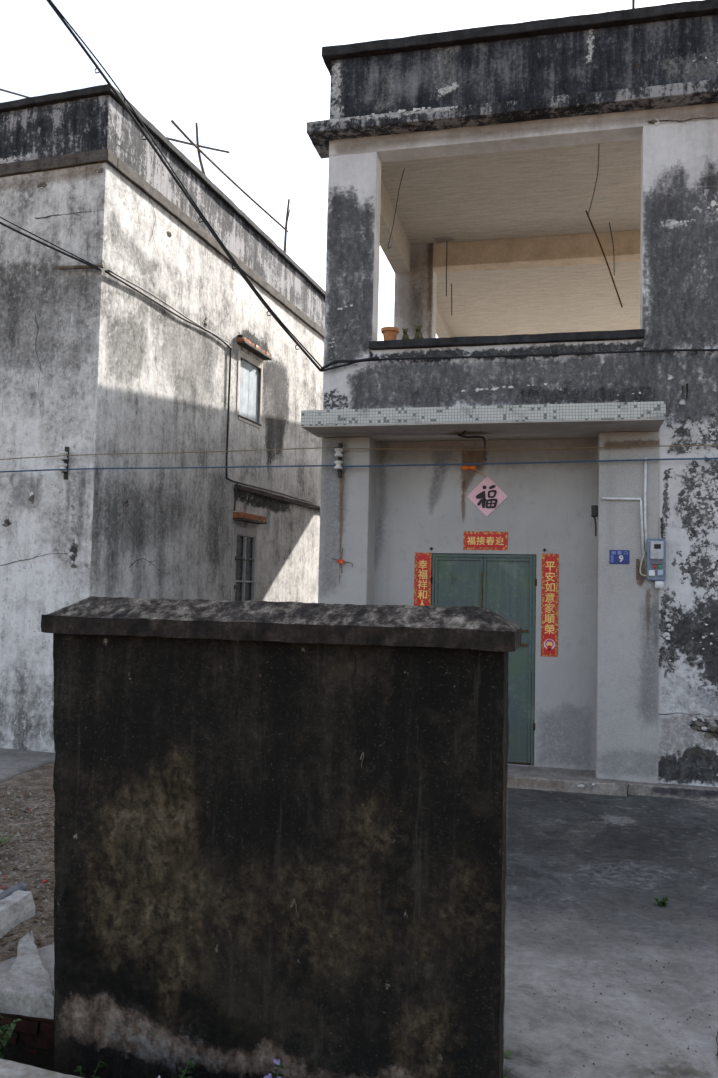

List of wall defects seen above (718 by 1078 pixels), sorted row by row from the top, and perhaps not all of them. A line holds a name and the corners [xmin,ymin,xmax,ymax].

peeling [659,189,718,229]
water stain [237,328,289,463]
water stain [323,165,718,696]
water stain [233,488,291,514]
flaking render [690,717,718,741]
water stain [56,883,270,1051]